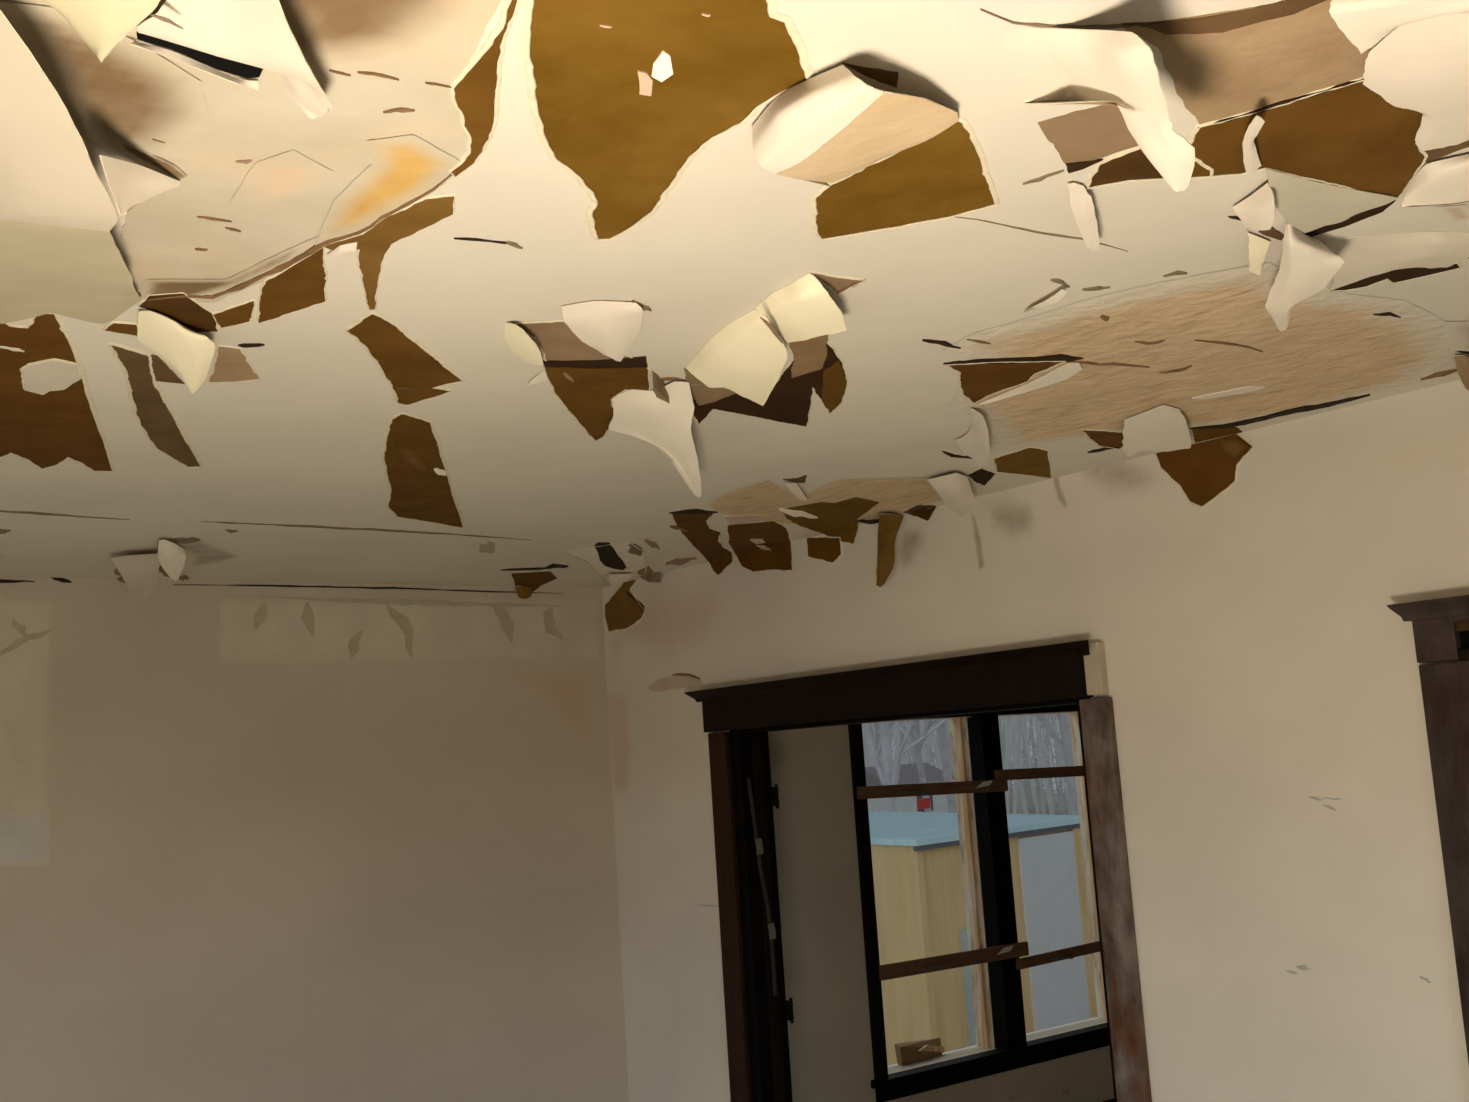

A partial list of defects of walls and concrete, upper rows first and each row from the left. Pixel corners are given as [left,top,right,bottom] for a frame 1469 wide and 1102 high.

peeling [1455,355,1469,391]
spalling [565,539,697,588]